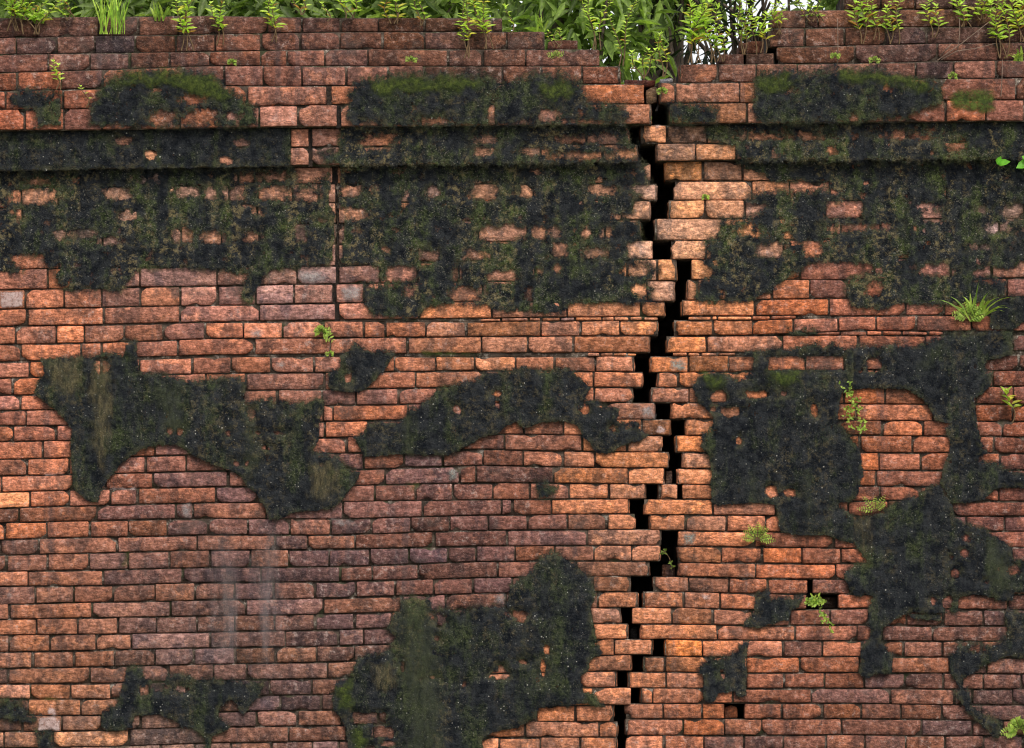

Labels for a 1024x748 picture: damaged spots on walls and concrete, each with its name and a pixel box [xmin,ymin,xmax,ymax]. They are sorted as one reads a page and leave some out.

crack [614,86,690,748]